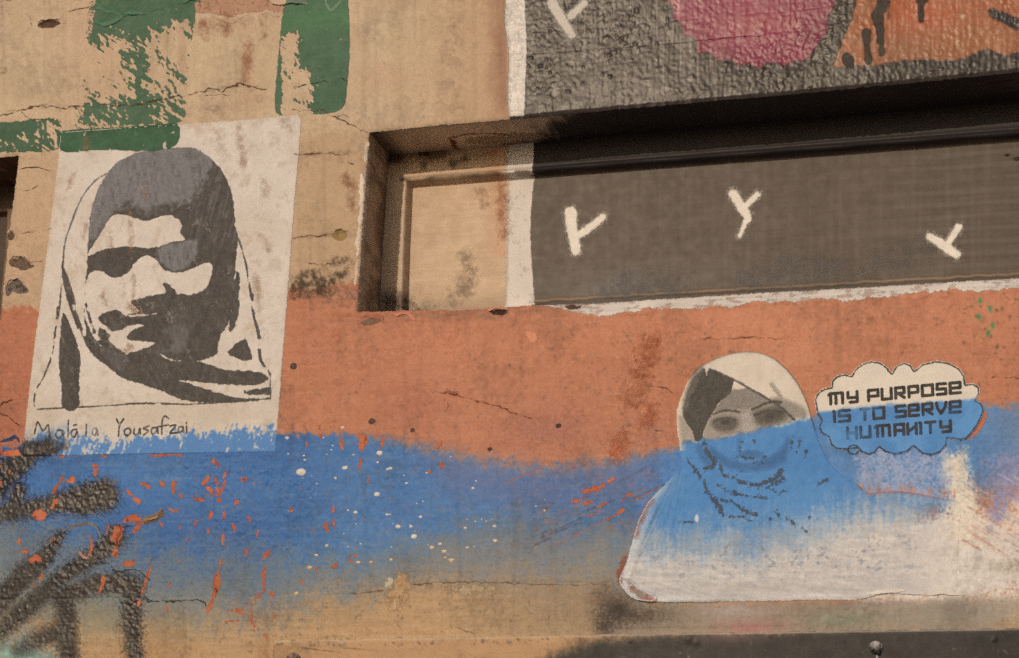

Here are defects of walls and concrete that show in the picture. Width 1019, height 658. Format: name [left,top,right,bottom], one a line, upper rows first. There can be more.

spalling [36,14,66,28]
peeling [195,0,308,23]
crack [2,83,266,120]
spalling [5,251,34,296]